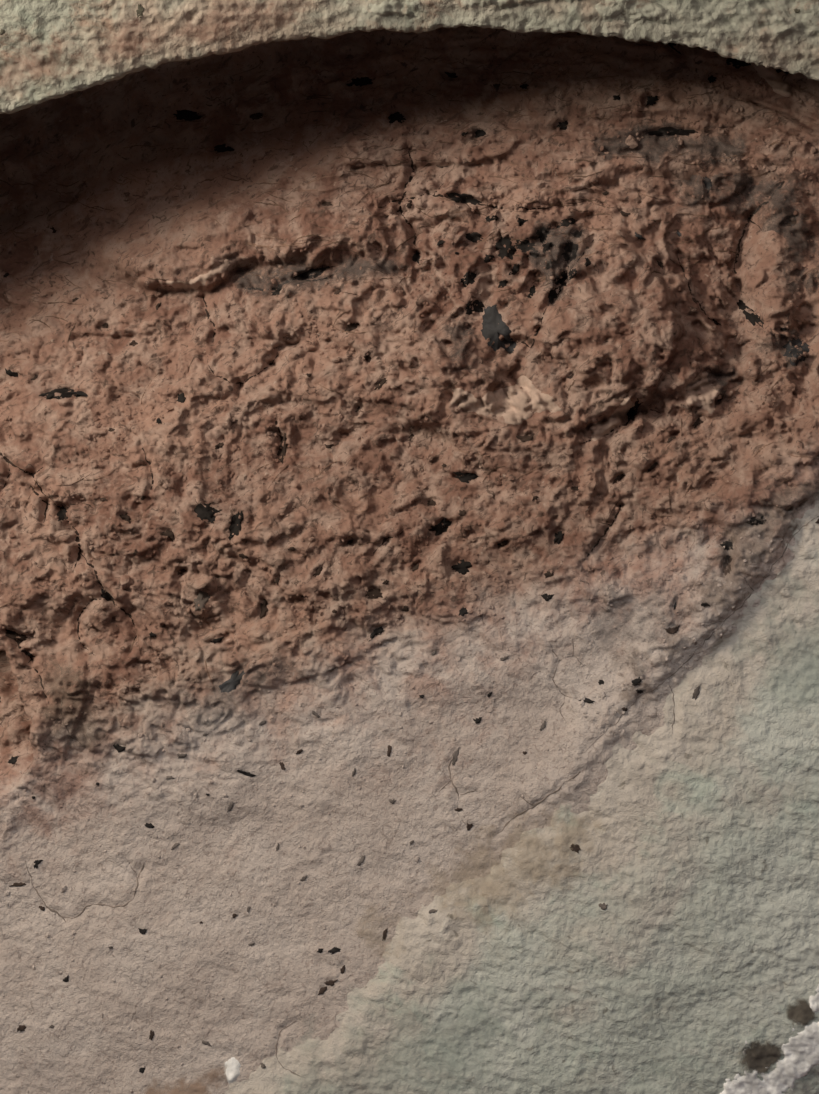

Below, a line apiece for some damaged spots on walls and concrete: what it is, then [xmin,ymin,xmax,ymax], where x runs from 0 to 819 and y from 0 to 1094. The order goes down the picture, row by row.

peeling [754,64,792,97]
peeling [166,259,229,293]
peeling [480,305,517,353]
peeling [450,375,562,425]
peeling [591,397,635,441]
peeling [685,371,722,414]
crack [0,452,137,655]
crack [5,629,86,748]
spalling [0,650,34,795]
water stain [146,1071,226,1094]